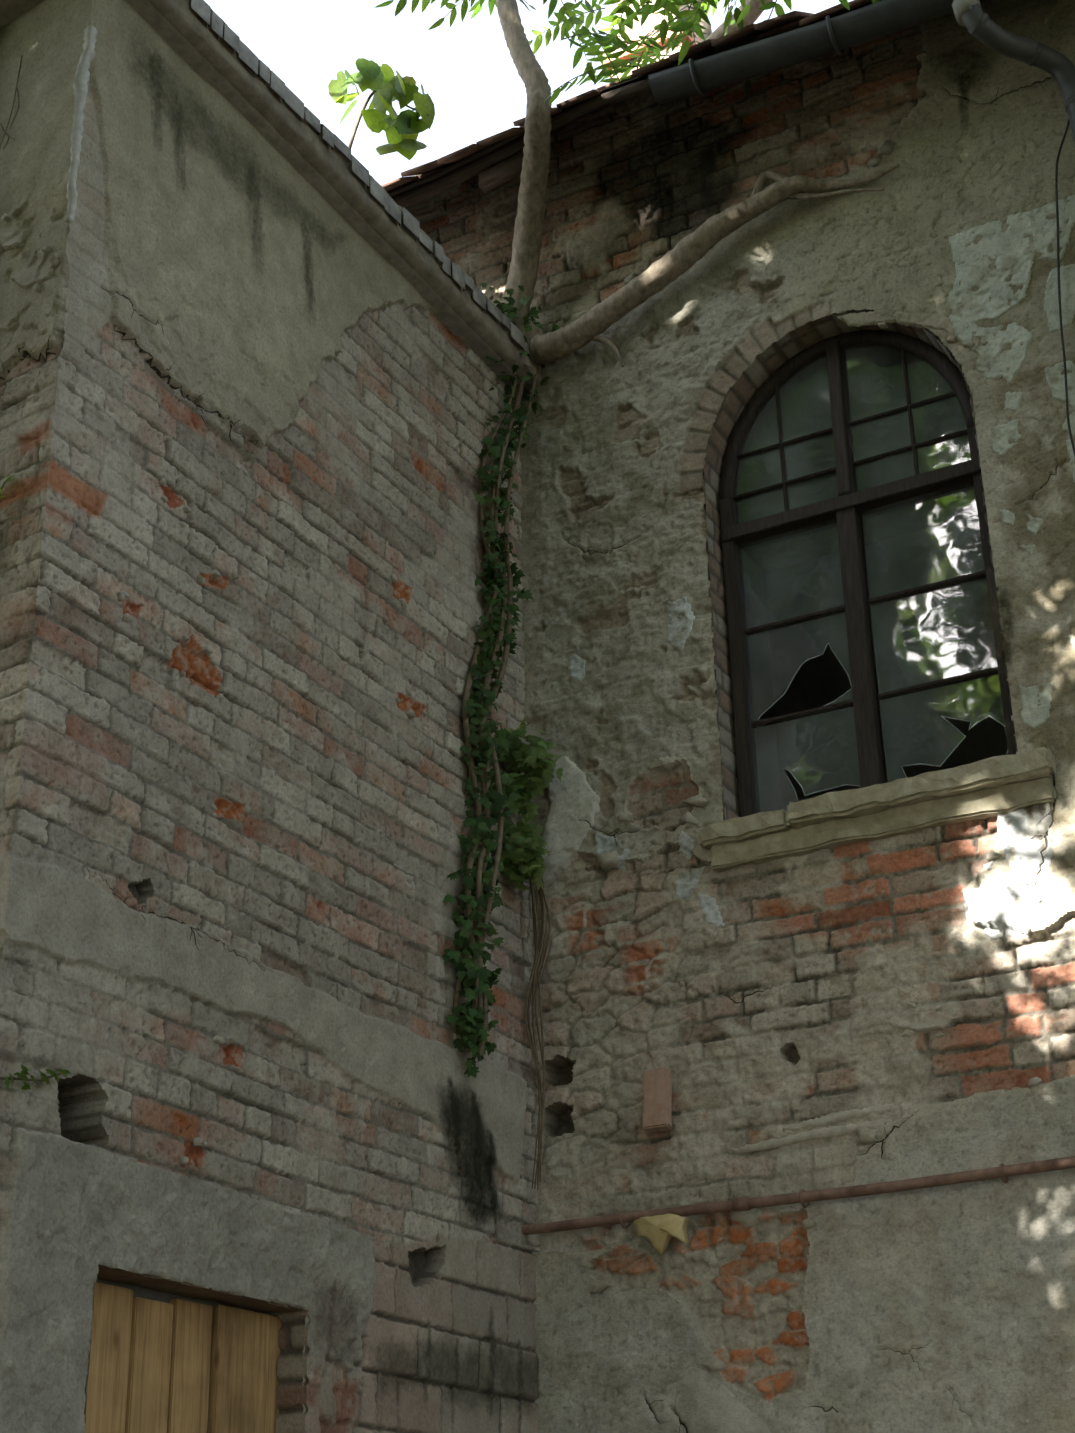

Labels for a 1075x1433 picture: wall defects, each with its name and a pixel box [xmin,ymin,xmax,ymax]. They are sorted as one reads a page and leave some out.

leakage [596,118,754,232]
spalling [156,477,192,513]
peeling [568,653,586,683]
spalling [525,755,1075,1403]
crack [644,1395,688,1433]
crack [877,1347,974,1426]